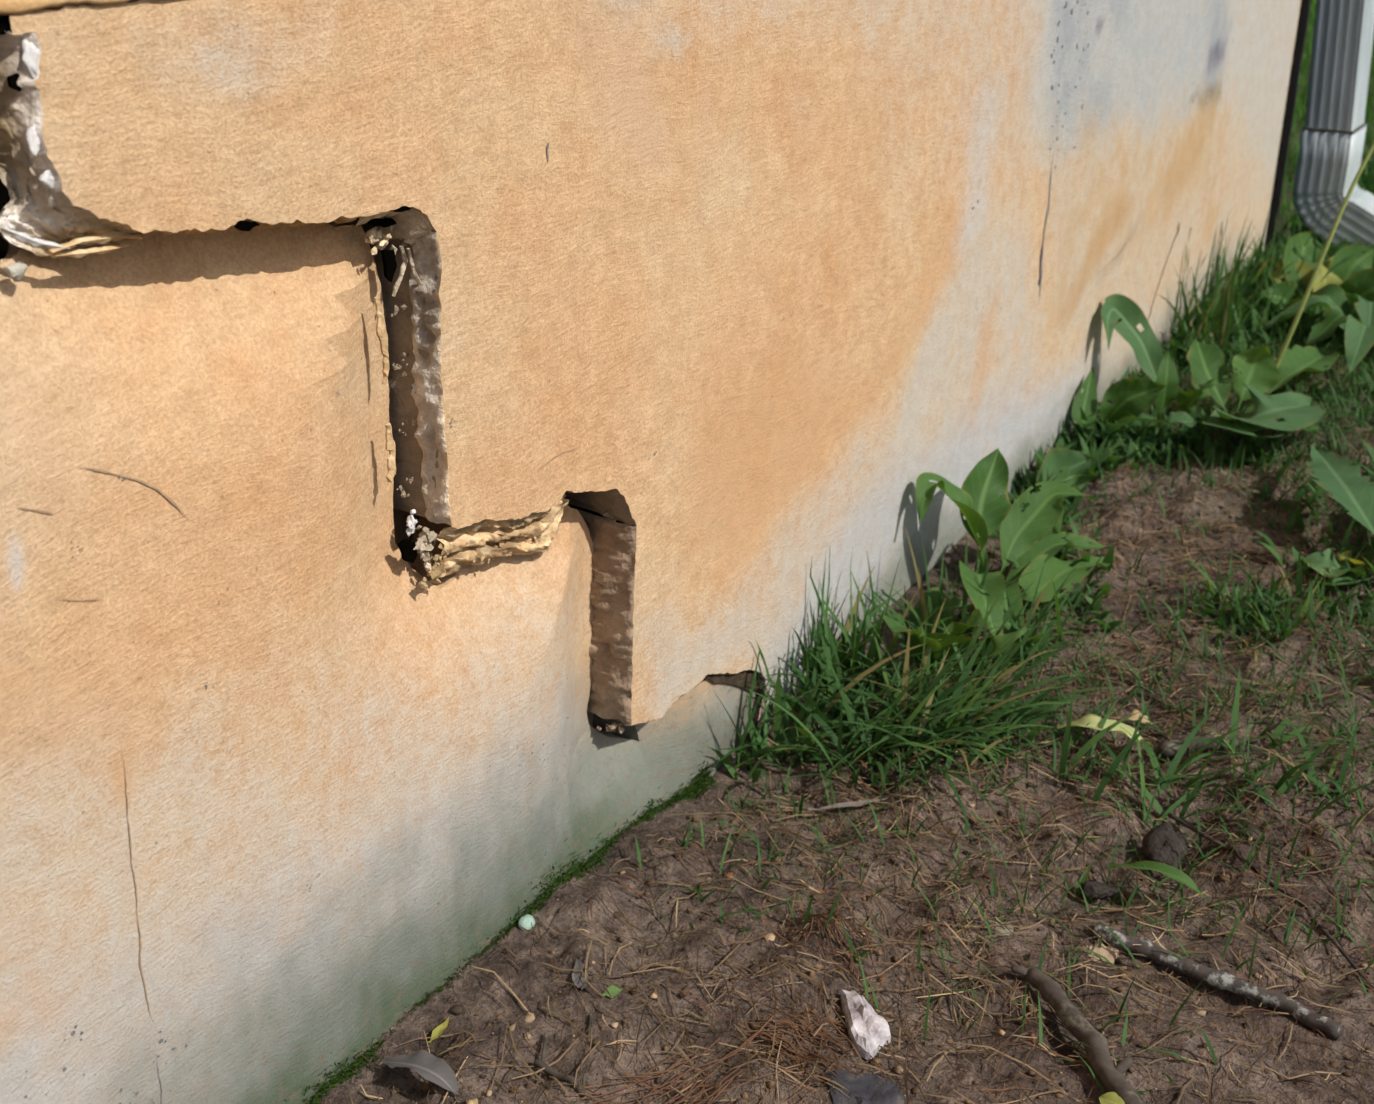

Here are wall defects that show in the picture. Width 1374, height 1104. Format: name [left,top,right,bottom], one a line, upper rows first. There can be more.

leakage [103,0,353,132]
crack [1038,149,1055,306]
crack [17,507,56,515]
crack [75,466,188,518]
crack [127,206,655,734]
leakage [507,0,1299,828]
crack [57,595,102,603]
crack [706,670,766,728]
crack [121,747,163,1104]